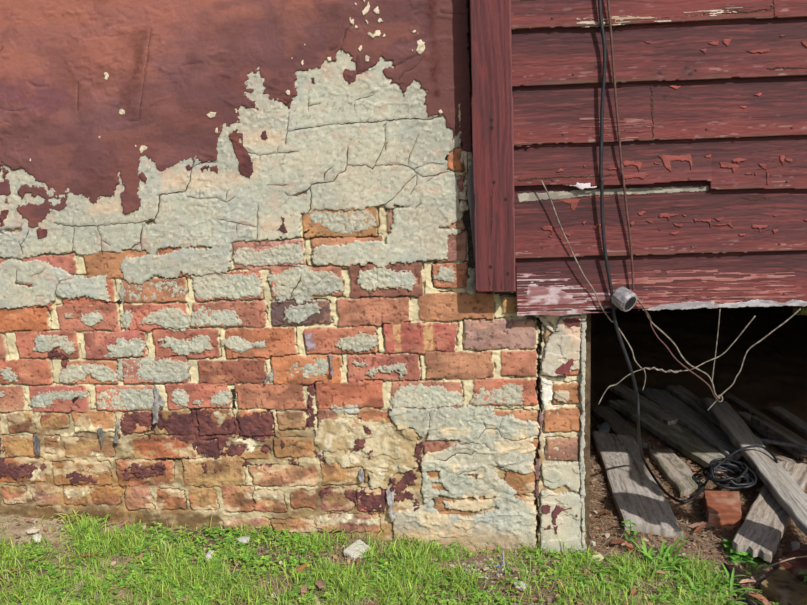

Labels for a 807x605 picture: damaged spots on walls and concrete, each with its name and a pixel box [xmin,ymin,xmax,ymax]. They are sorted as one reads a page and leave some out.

peeling [349,0,385,38]
peeling [412,30,425,55]
peeling [576,16,671,28]
peeling [684,7,743,16]
crack [248,95,448,212]
peeling [517,160,709,211]
peeling [0,45,473,473]
crack [437,319,566,541]
spalling [287,270,807,554]
peeling [0,434,47,481]
peeling [66,471,97,485]
peeling [123,462,166,481]